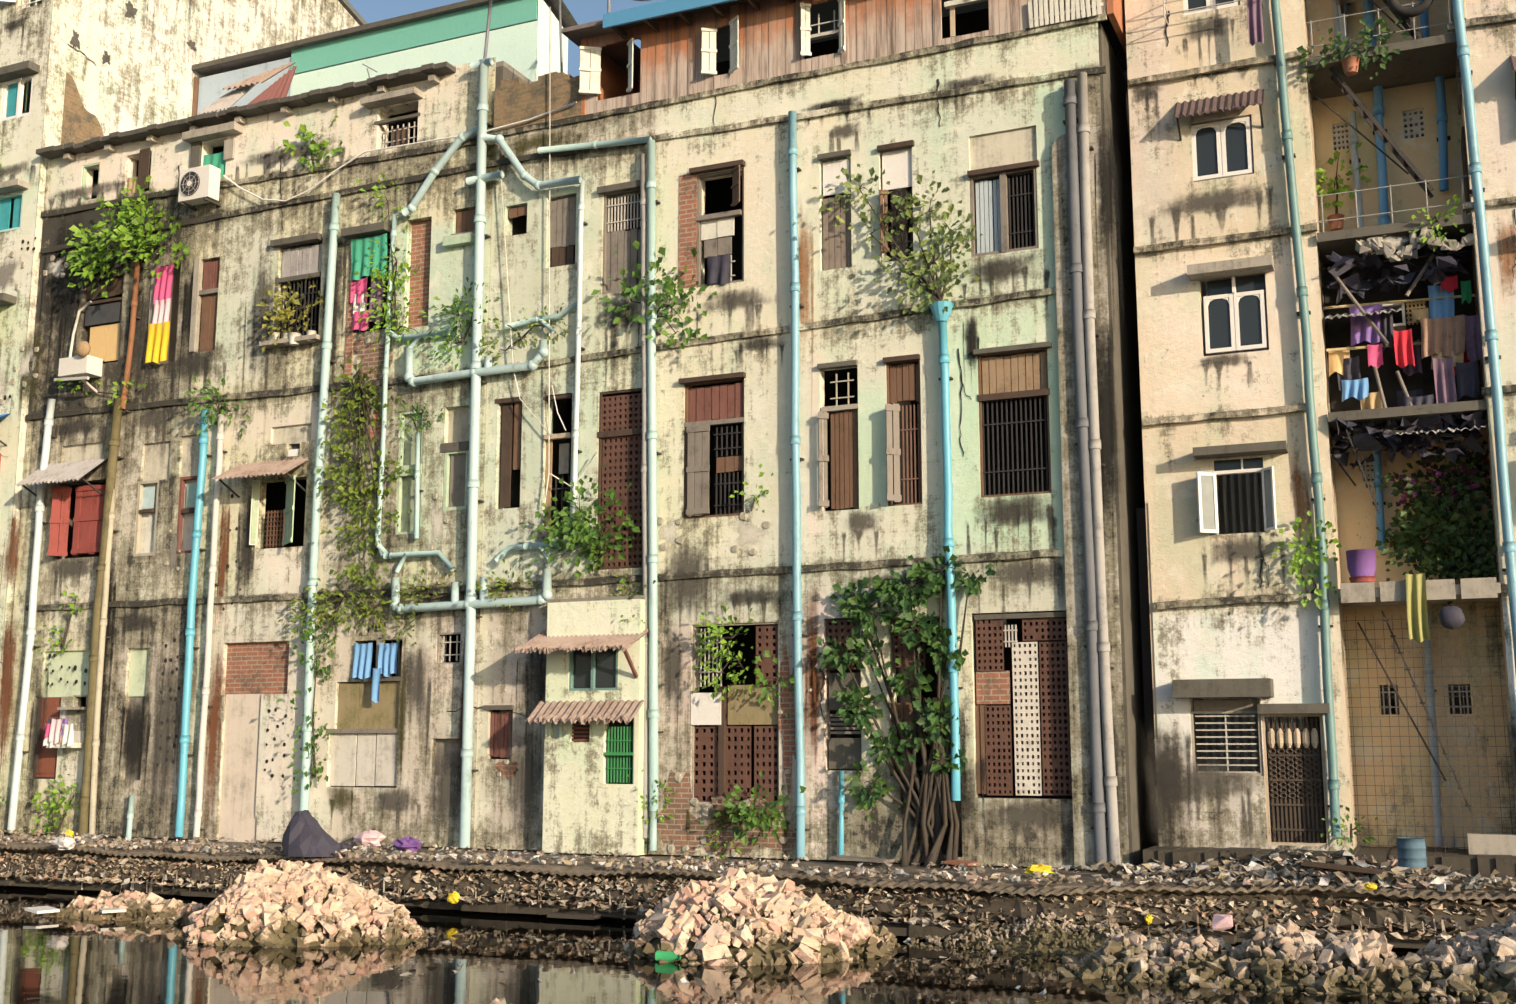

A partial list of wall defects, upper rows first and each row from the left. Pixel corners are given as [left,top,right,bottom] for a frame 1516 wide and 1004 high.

leakage [1183,17,1248,83]
peeling [61,72,104,145]
leakage [808,98,870,151]
corrosion [1497,227,1515,281]
leakage [43,420,106,449]
corrosion [1294,470,1311,531]
corrosion [0,518,20,587]
leakage [967,496,1063,614]
corrosion [0,619,16,751]
leakage [97,550,179,805]
leakage [661,639,681,739]
leakage [1146,733,1253,832]